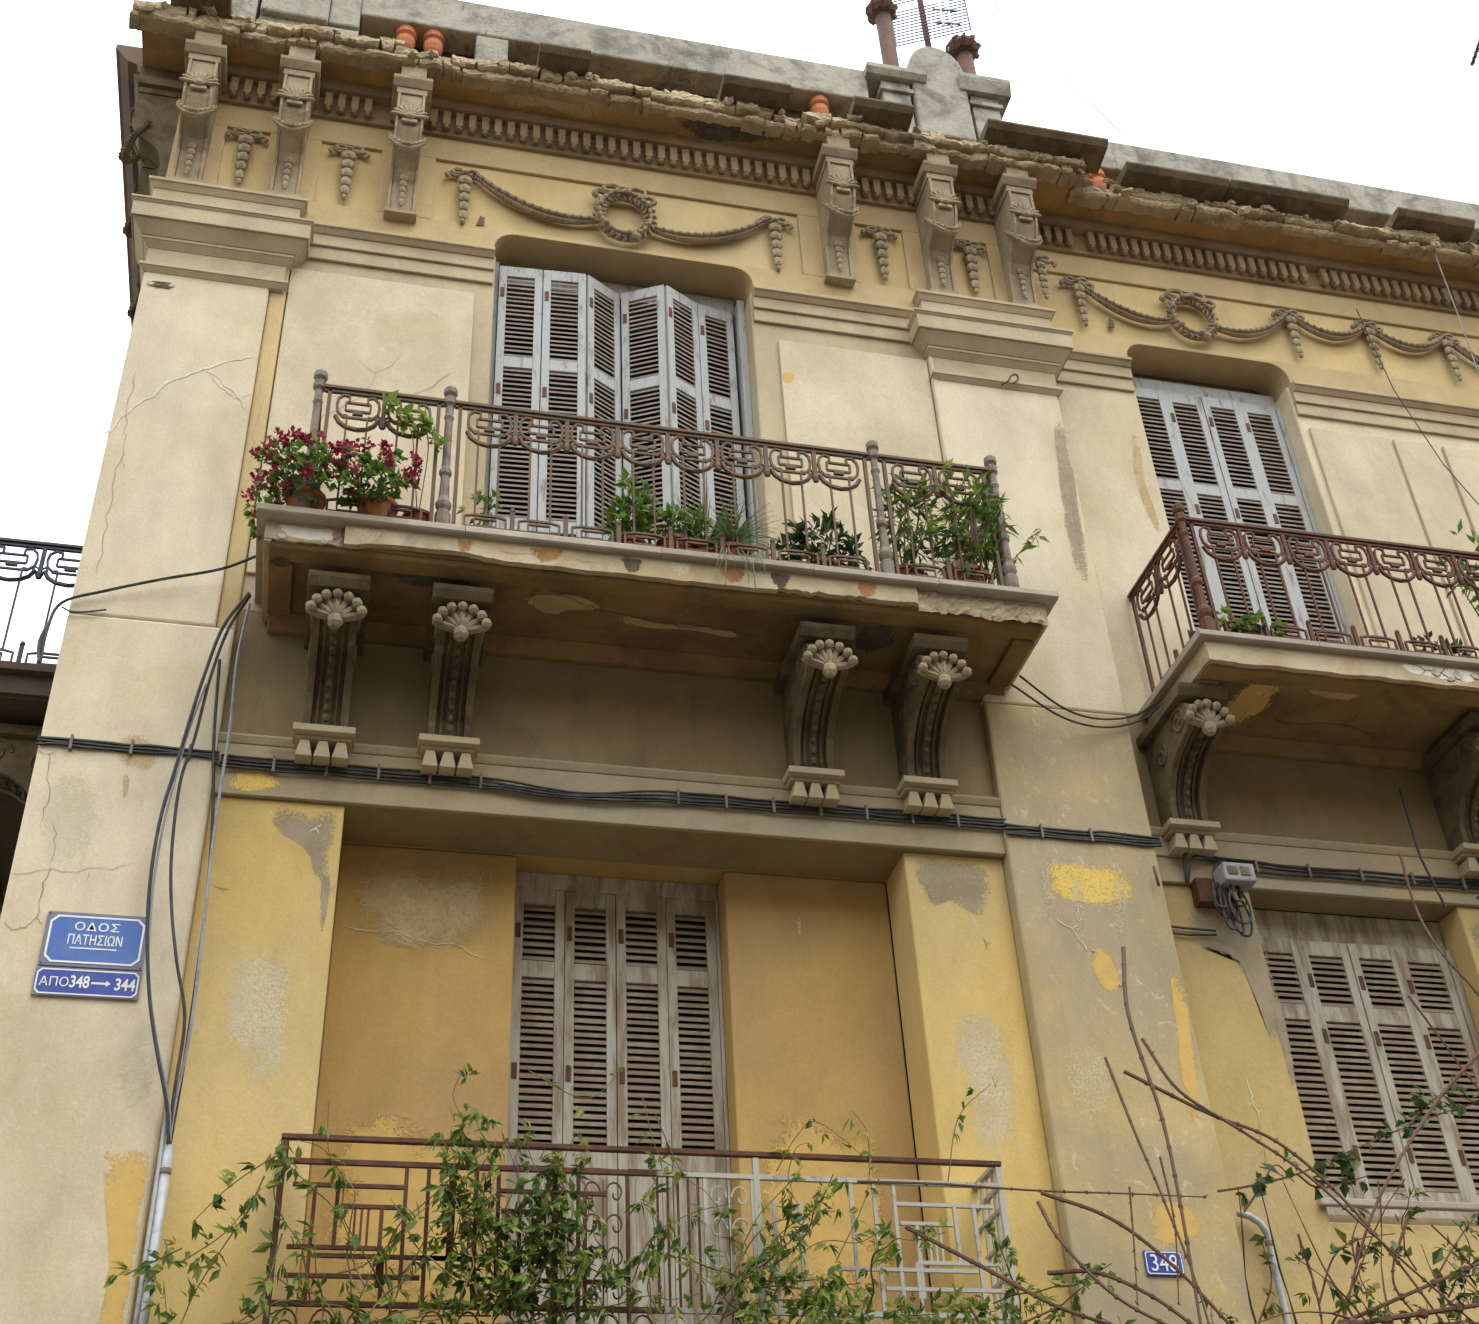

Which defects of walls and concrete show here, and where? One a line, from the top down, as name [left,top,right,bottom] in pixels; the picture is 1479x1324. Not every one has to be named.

flaking render [129,0,1479,268]
flaking render [147,280,175,289]
crack [97,357,264,565]
crack [4,750,131,930]